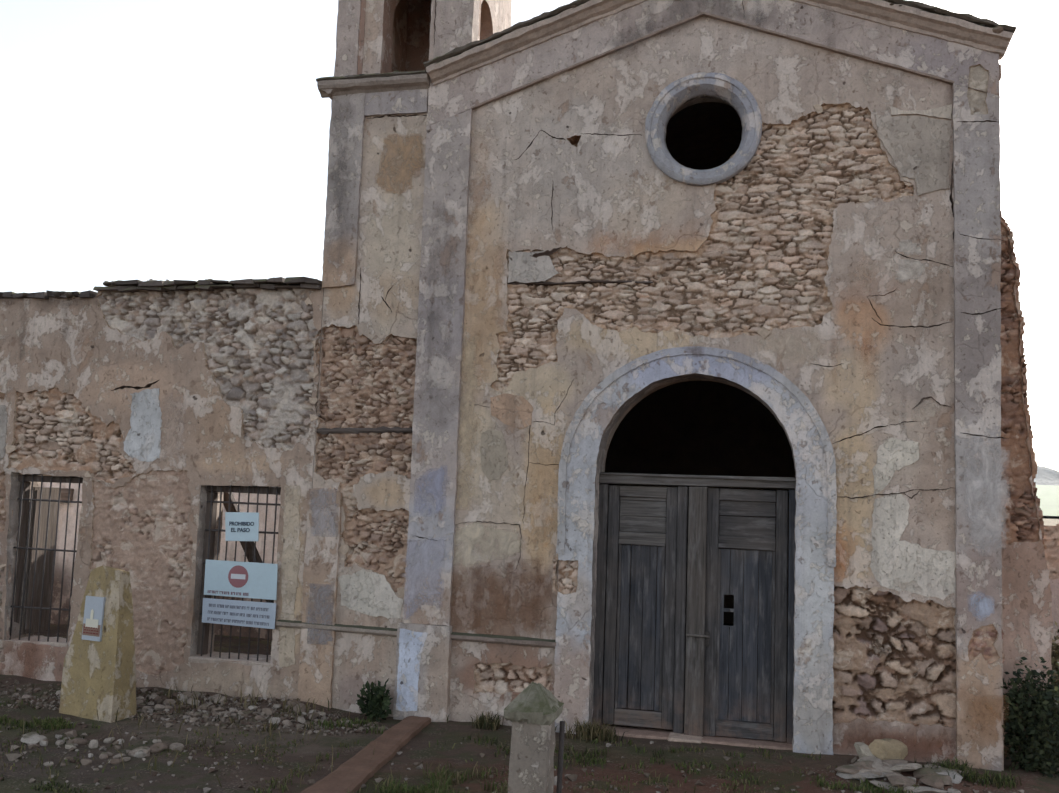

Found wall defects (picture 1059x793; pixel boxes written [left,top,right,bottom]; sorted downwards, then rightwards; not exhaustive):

crack [515,130,641,160]
flaking render [762,102,952,196]
crack [949,162,1003,241]
flaking render [490,249,558,387]
crack [867,288,1002,328]
flaking render [0,387,120,532]
crack [833,396,952,444]
crack [845,487,951,499]
peeling [967,442,1007,545]
spalling [1000,221,1059,545]
flaking render [61,467,199,676]
flaking render [338,506,428,711]